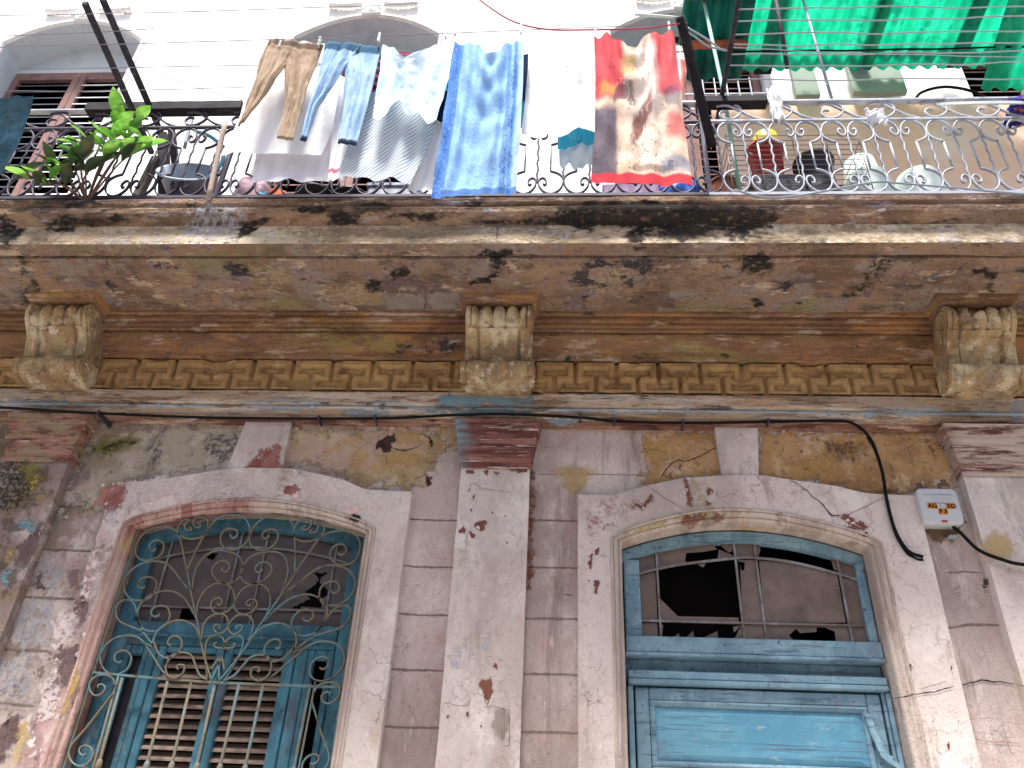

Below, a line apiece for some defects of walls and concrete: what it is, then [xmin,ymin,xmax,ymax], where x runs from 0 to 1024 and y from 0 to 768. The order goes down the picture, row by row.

leakage [0,214,25,246]
leakage [483,197,782,246]
leakage [92,436,136,455]
spalling [71,409,455,513]
peeling [457,469,527,543]
spalling [588,430,741,594]
crack [646,447,716,510]
crack [793,481,881,516]
spalling [758,430,957,495]
spalling [925,516,967,543]
spalling [479,663,509,740]
crack [894,679,1023,699]